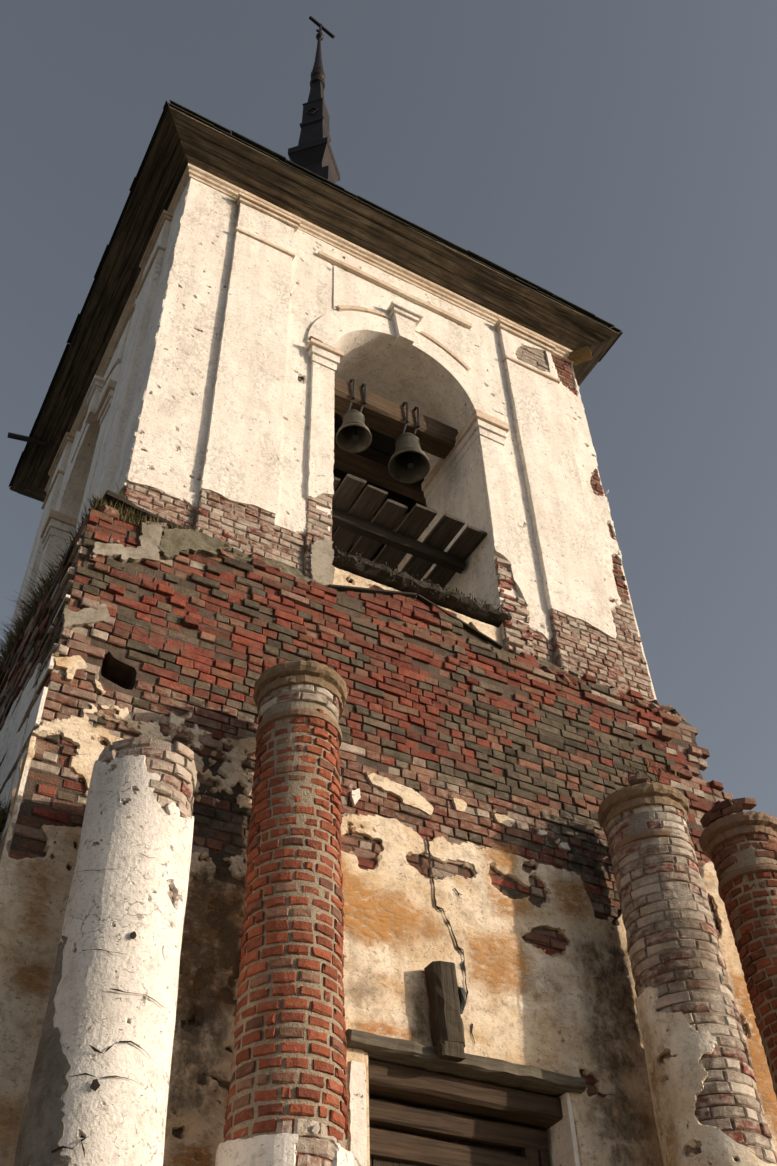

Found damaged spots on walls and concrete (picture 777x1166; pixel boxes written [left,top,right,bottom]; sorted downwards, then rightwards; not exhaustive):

spalling [516,343,577,394]
spalling [607,520,630,603]
spalling [159,725,255,876]
spalling [341,826,383,870]
spalling [405,851,472,880]
spalling [489,859,548,908]
crack [426,836,476,1043]
crack [110,988,163,1007]
leakage [170,868,240,1108]
leakage [582,945,641,1079]
crack [69,1041,152,1085]
crack [51,1136,89,1157]